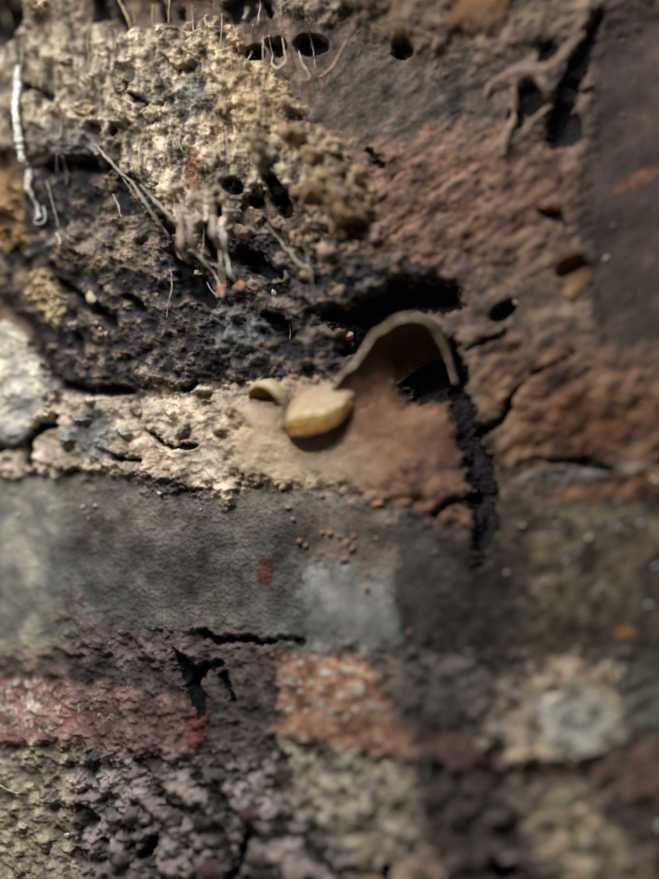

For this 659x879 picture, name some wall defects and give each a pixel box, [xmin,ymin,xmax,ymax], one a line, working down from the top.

spalling [0,0,463,503]
crack [434,329,576,568]